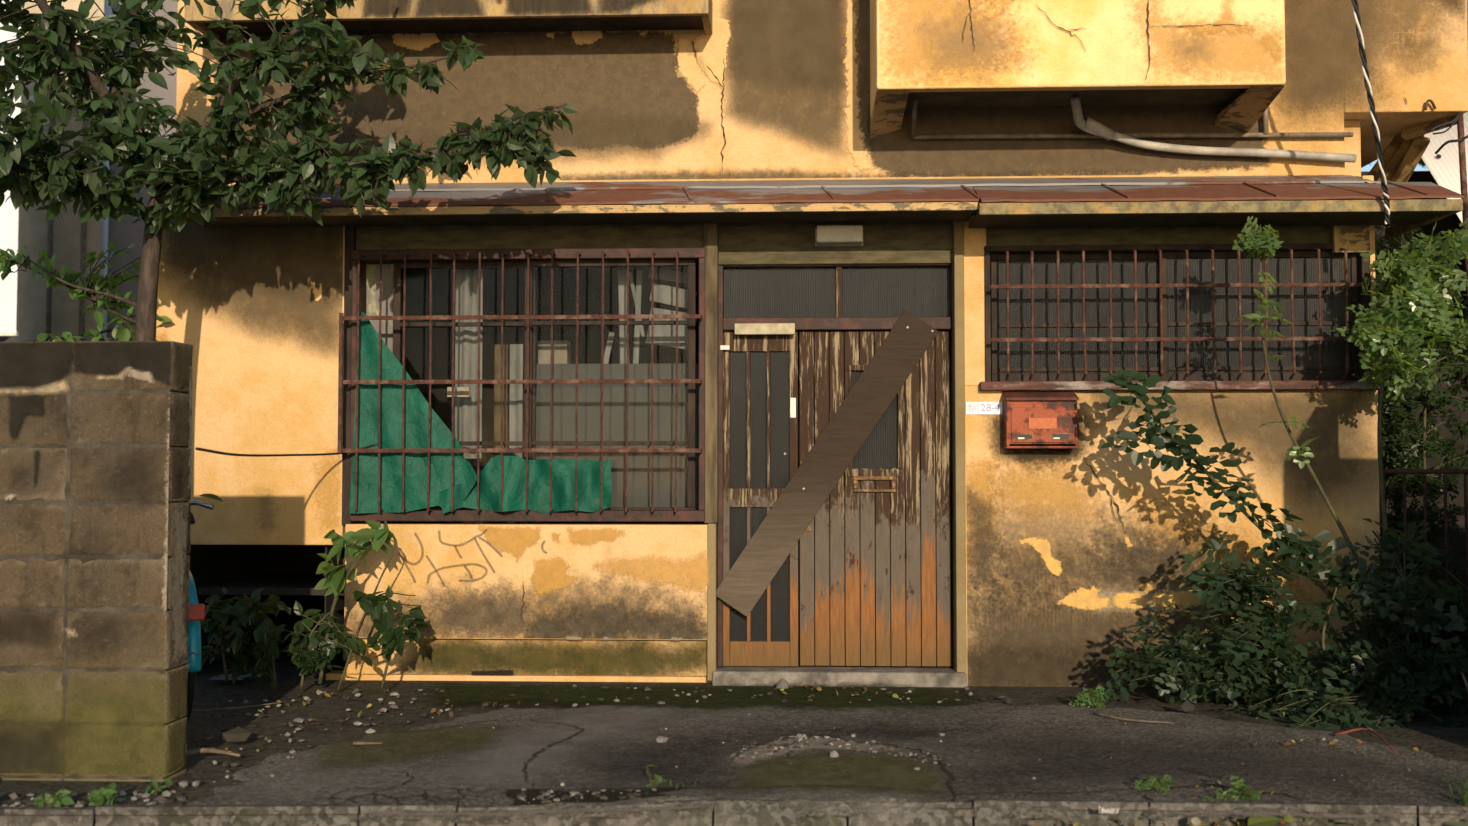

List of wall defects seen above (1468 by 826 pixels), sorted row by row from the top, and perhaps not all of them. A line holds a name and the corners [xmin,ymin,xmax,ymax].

peeling [545,31,603,45]
crack [962,0,975,49]
crack [1036,4,1086,50]
water stain [212,0,699,163]
crack [706,60,726,173]
water stain [562,0,1269,180]
water stain [350,586,707,639]
peeling [478,526,625,594]
peeling [597,556,709,589]
peeling [1019,537,1062,576]
peeling [1056,582,1231,611]
crack [301,718,1303,807]